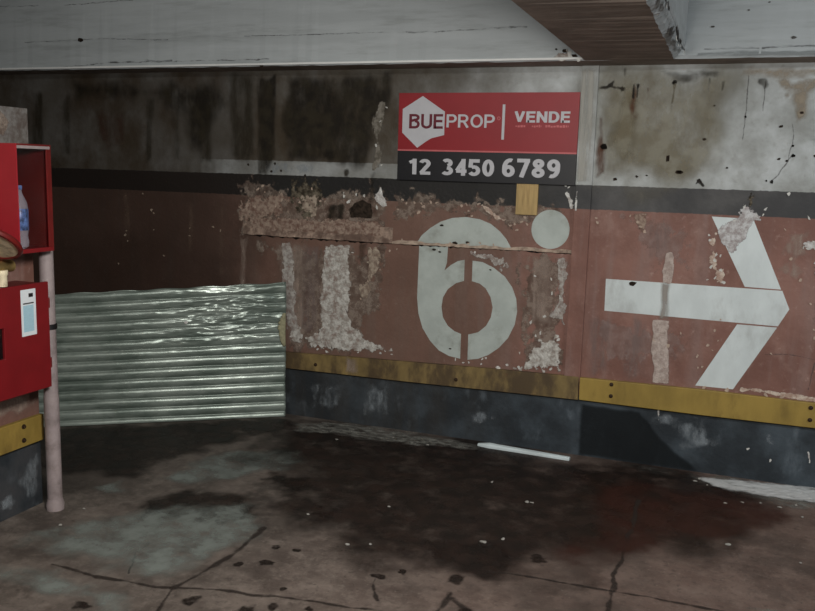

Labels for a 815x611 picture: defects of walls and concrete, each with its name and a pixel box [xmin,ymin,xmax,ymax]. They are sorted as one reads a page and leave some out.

leakage [232,74,390,176]
peeling [237,101,577,235]
leakage [597,69,726,180]
leakage [752,70,815,118]
peeling [257,235,324,352]
peeling [345,244,398,334]
peeling [452,241,568,373]
peeling [651,252,674,384]
peeling [706,193,767,284]
crack [52,527,379,611]
crack [437,593,472,611]
crack [485,500,721,611]